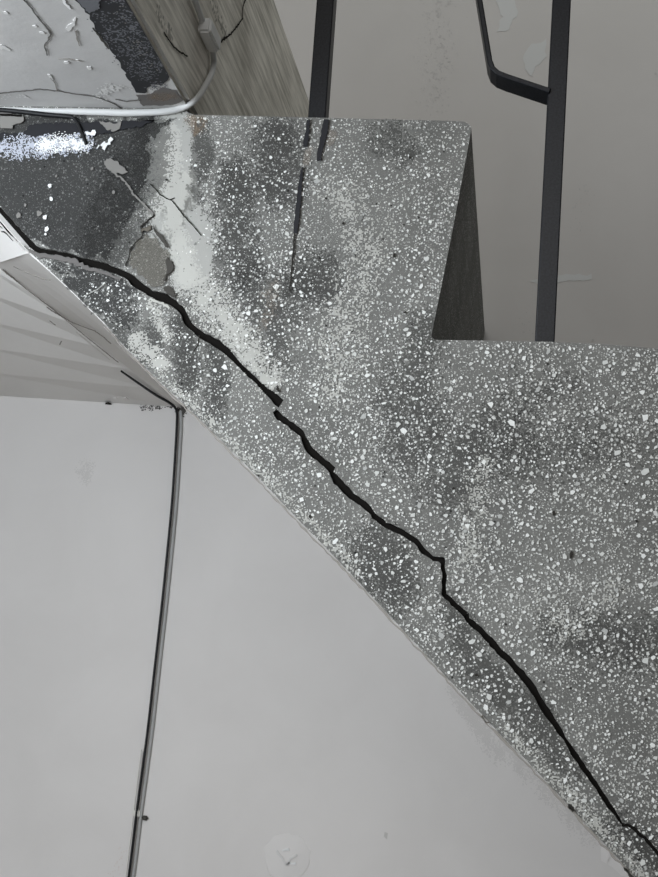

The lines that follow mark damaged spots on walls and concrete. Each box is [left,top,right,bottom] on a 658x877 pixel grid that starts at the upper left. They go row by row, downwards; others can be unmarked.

crack [23,0,109,62]
peeling [77,0,168,90]
crack [0,78,140,117]
peeling [99,121,123,138]
spalling [399,122,465,183]
crack [0,184,658,877]
spalling [29,144,658,877]